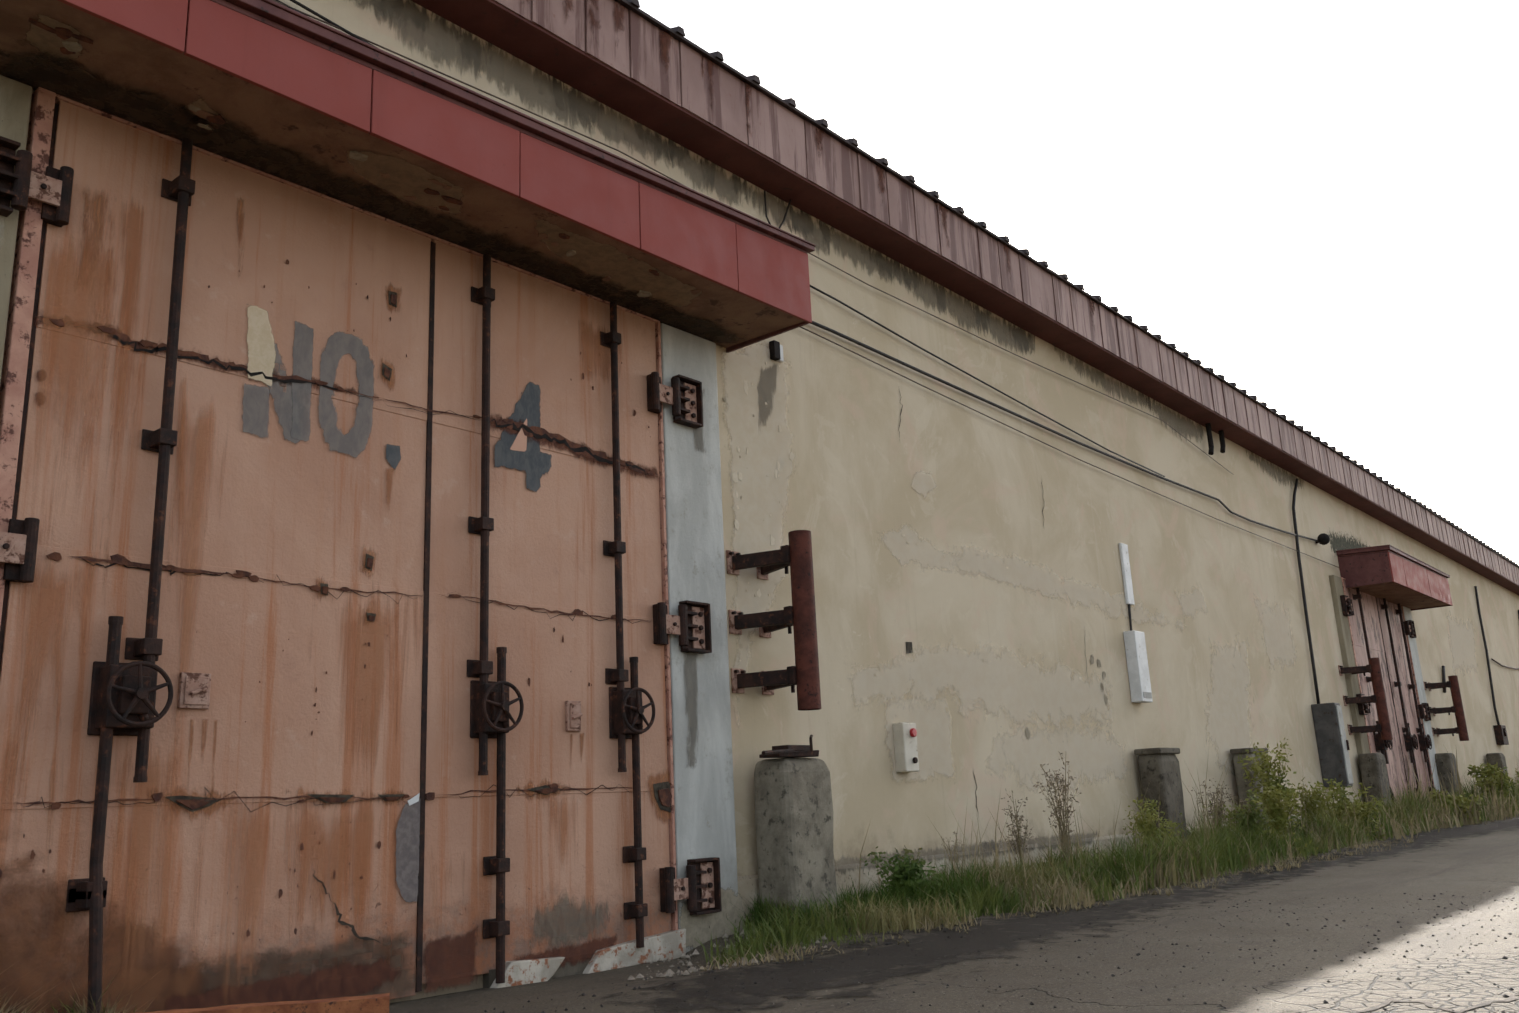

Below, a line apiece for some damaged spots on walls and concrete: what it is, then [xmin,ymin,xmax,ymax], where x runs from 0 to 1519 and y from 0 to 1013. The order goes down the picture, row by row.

rust [660,32,671,67]
rust [36,370,46,405]
crack [35,316,658,478]
crack [46,552,654,624]
crack [2,783,633,812]
rust [516,897,617,966]